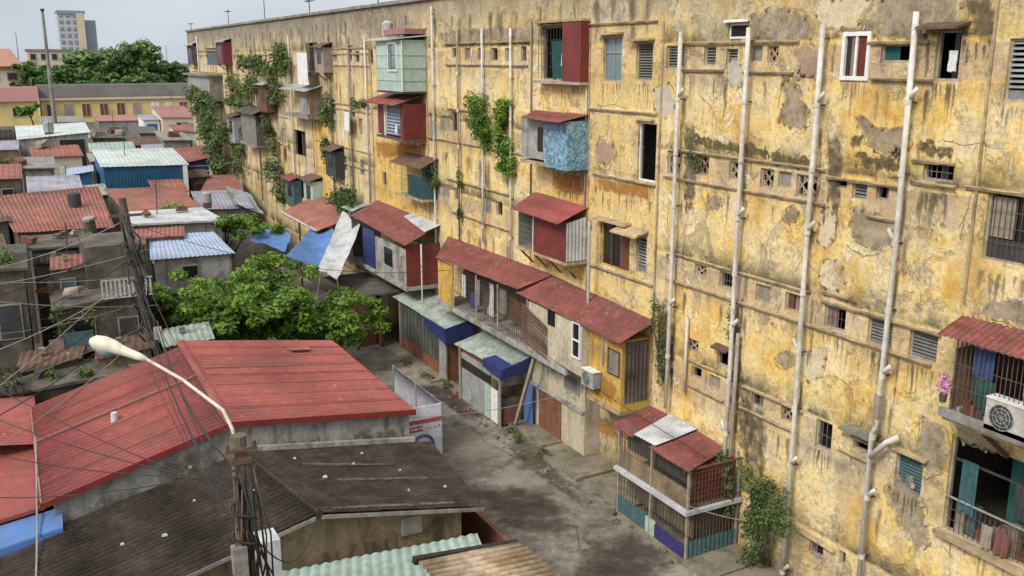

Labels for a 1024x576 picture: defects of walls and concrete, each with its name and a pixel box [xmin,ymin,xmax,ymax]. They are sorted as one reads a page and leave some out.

peeling [726,57,744,90]
peeling [748,0,969,133]
peeling [653,82,676,119]
peeling [596,141,618,165]
water stain [683,128,810,213]
peeling [854,116,914,161]
rust [554,173,650,211]
peeling [816,205,900,293]
peeling [774,346,828,383]